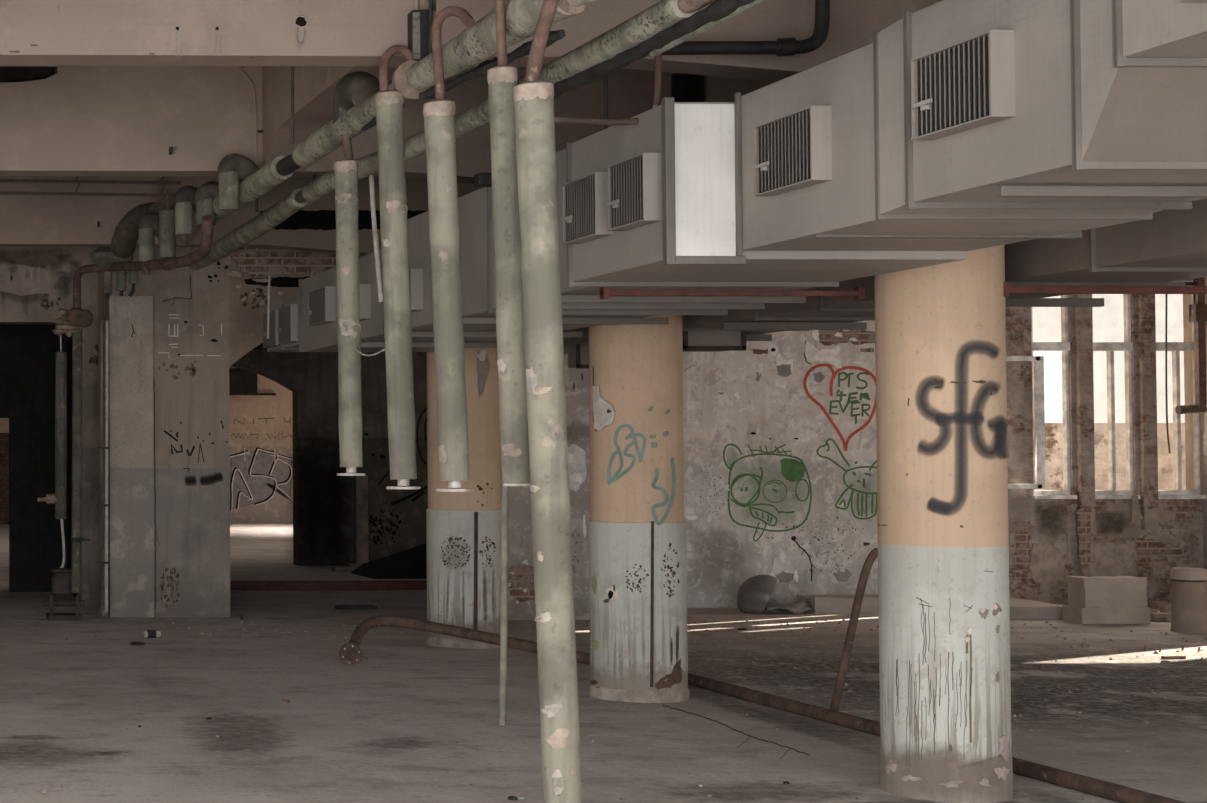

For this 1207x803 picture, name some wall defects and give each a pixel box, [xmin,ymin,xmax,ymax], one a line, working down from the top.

spalling [235,273,313,309]
peeling [593,366,616,432]
peeling [1014,504,1200,584]
spalling [885,735,1012,793]